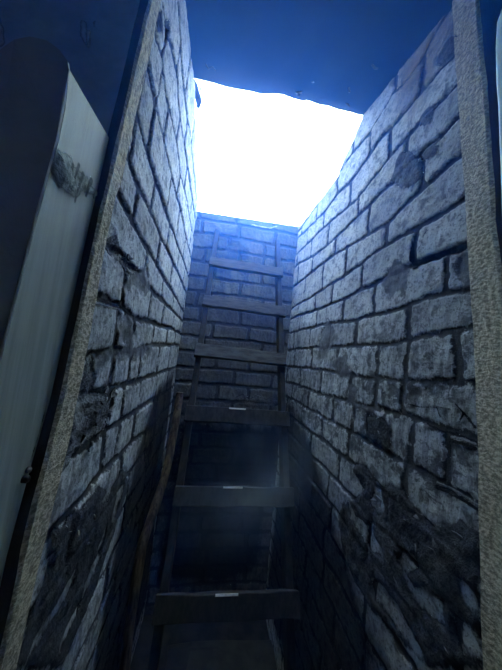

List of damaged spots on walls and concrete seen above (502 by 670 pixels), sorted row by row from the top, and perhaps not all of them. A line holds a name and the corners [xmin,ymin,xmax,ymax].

spalling [105,234,135,277]